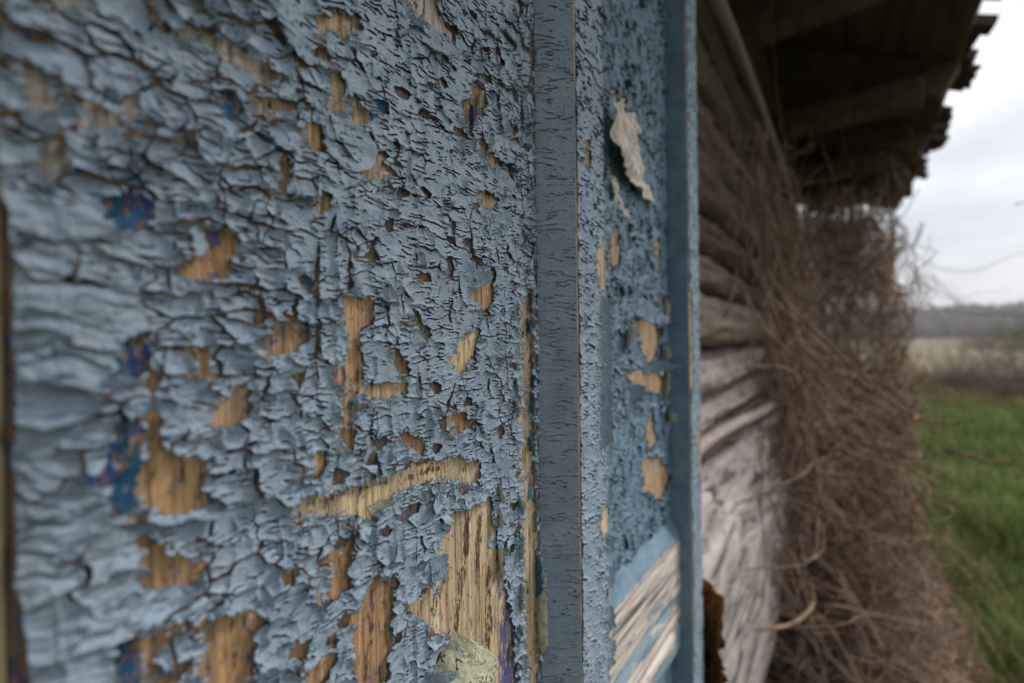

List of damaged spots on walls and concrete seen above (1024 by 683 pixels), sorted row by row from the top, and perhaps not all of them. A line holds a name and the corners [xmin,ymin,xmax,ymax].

crack [437,0,503,83]
peeling [0,43,156,183]
peeling [94,180,257,286]
crack [177,157,261,204]
crack [235,287,307,312]
peeling [145,0,400,191]
crack [338,218,357,294]
crack [402,185,497,264]
crack [419,109,481,143]
peeling [456,82,534,239]
peeling [78,259,549,683]
peeling [588,220,695,670]